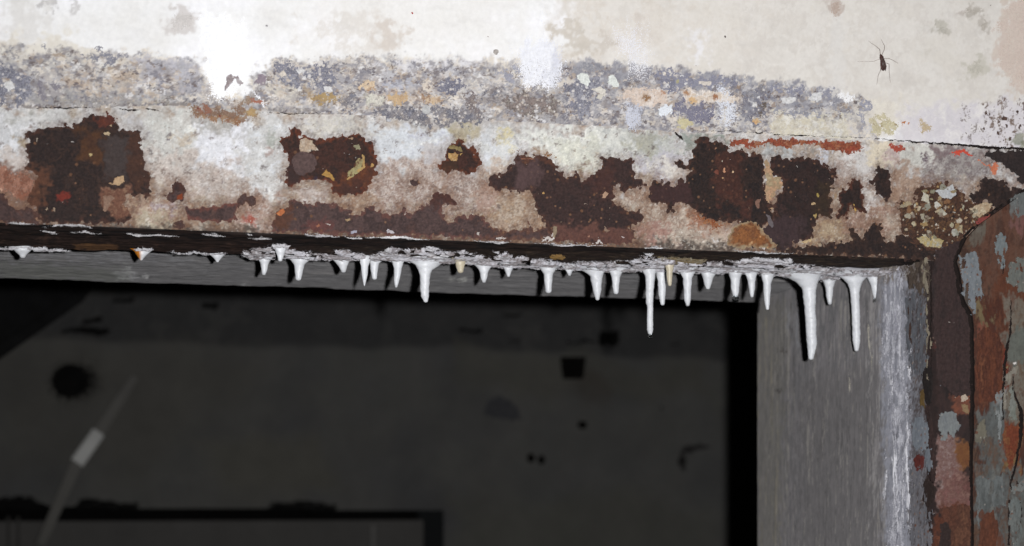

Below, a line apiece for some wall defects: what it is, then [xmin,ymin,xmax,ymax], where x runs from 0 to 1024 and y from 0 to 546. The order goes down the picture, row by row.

spalling [224,60,619,130]
spalling [652,67,873,131]
rust [0,111,256,229]
water stain [6,222,101,234]
water stain [124,233,176,251]
rust [271,126,1024,507]
peeling [958,251,984,315]
peeling [994,232,1024,293]
water stain [242,233,913,546]
peeling [903,257,969,546]
peeling [975,362,1018,445]
rust [978,510,999,546]